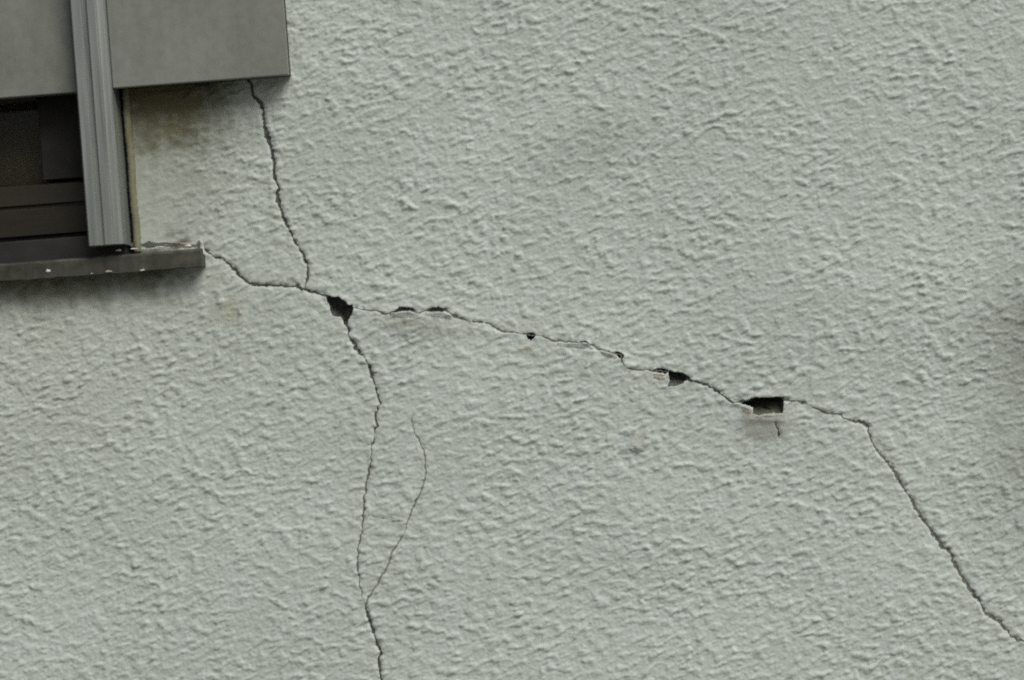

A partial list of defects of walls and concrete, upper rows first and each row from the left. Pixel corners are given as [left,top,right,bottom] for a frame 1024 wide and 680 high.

crack [204,80,329,298]
spalling [326,295,353,325]
crack [345,306,751,680]
spalling [654,368,689,387]
spalling [740,397,784,438]
crack [783,399,1024,641]